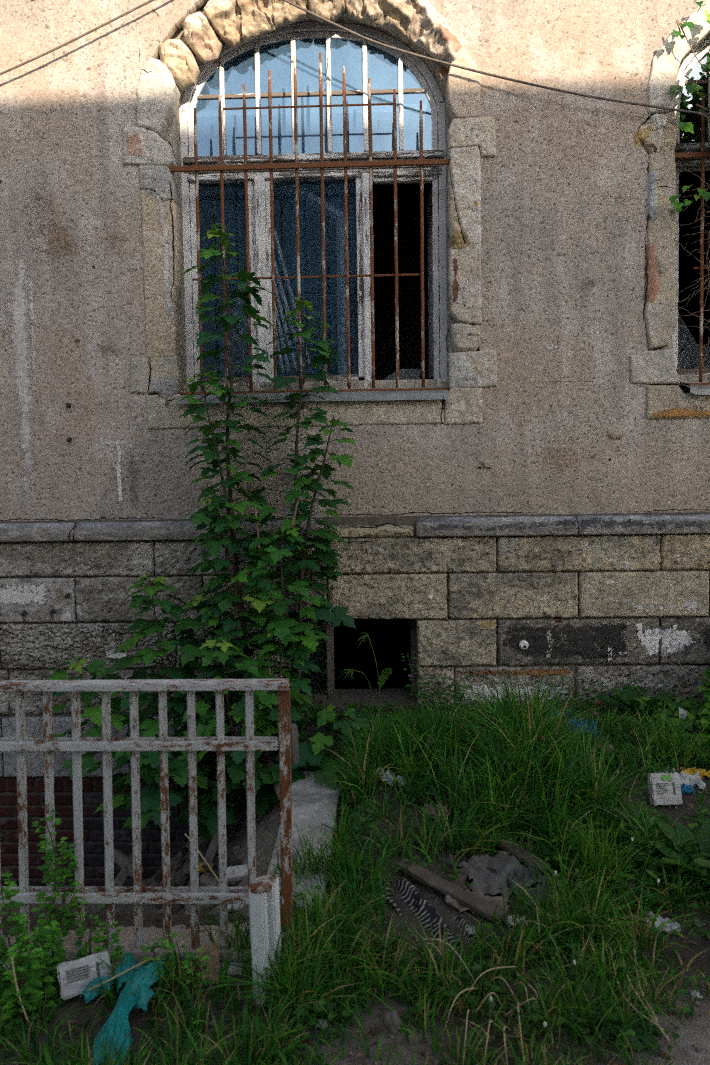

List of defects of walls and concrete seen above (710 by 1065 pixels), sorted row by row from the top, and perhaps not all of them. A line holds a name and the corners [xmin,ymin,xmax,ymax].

spalling [645,243,665,303]
leakage [0,252,36,505]
corrosion [652,406,710,418]
leakage [633,600,699,657]